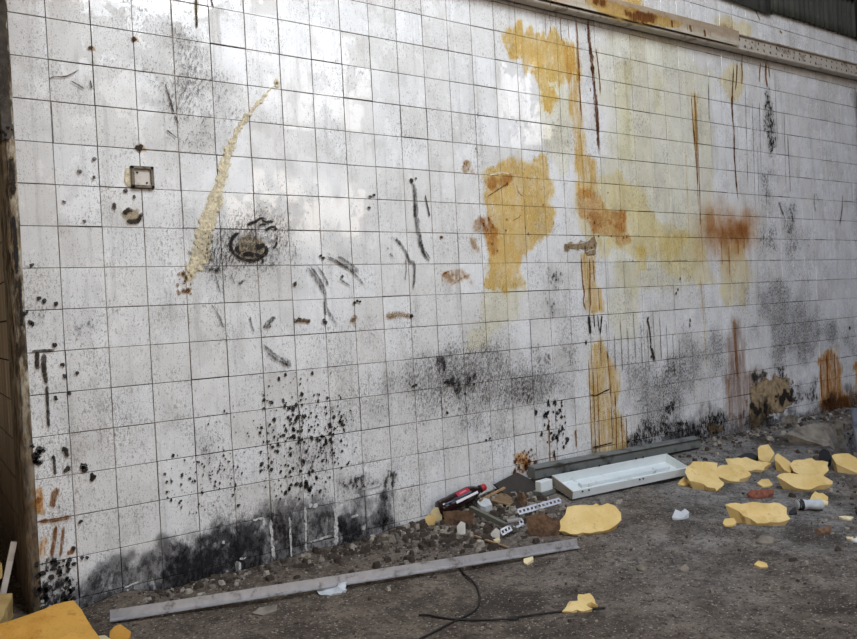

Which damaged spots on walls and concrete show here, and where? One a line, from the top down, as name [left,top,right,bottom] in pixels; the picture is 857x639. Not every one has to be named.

rust [626,11,656,23]
rust [545,21,601,147]
rust [691,96,700,202]
rust [582,261,603,345]
water stain [407,341,577,461]
rust [589,353,628,448]
spalling [746,370,794,428]
water stain [76,353,397,609]